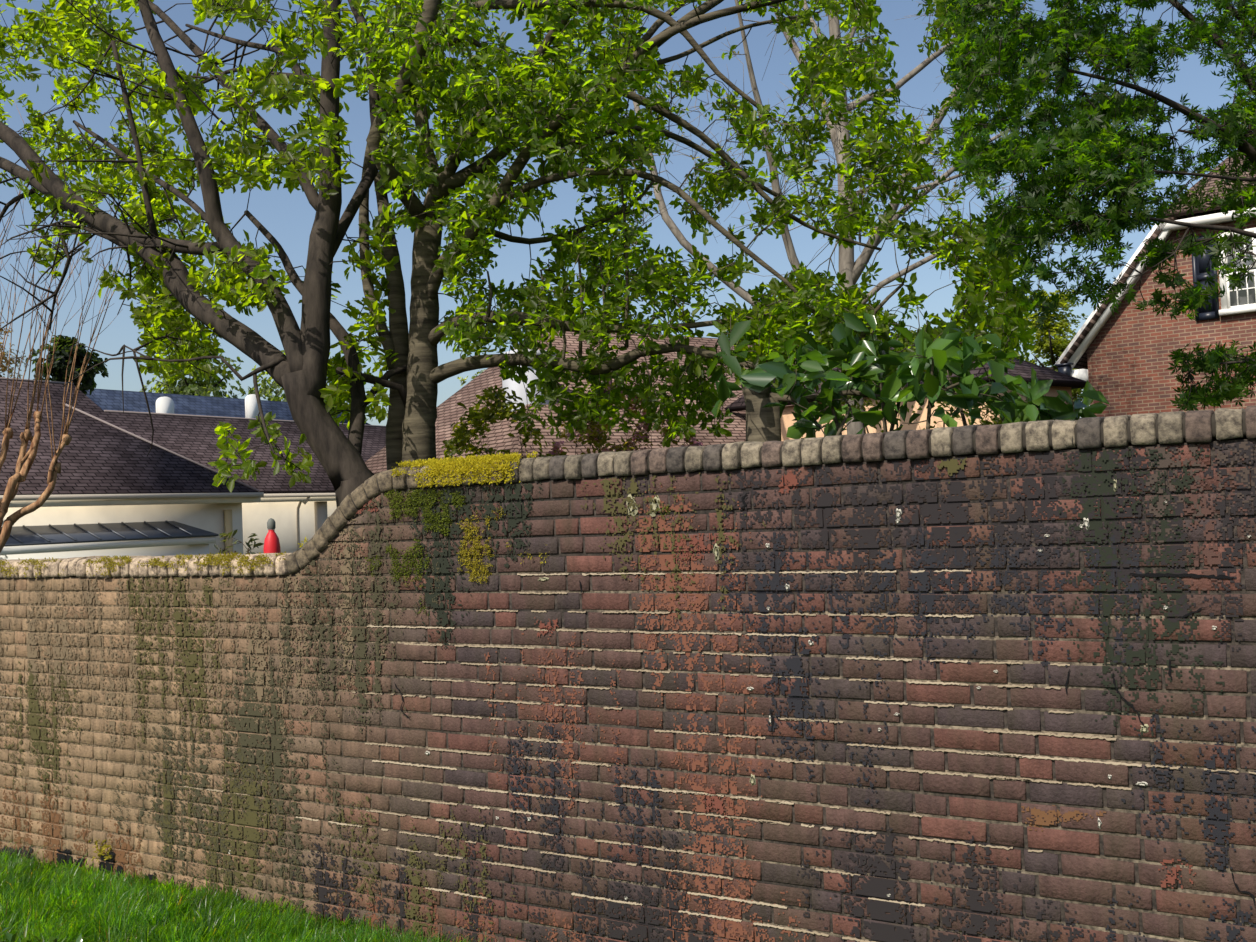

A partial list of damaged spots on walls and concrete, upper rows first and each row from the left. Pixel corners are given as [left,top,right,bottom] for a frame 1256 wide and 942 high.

leakage [0,441,1256,942]